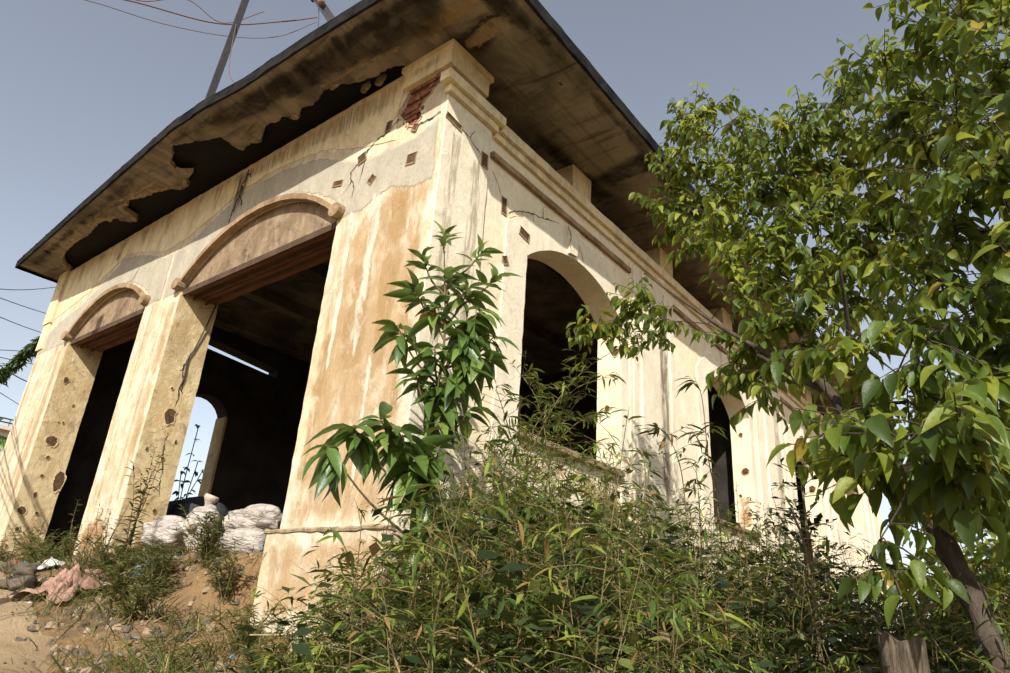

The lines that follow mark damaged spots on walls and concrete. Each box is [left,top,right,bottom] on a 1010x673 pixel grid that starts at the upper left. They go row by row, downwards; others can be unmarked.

leakage [484,0,550,45]
leakage [210,0,438,125]
crack [343,111,441,198]
flaking render [38,62,463,369]
crack [462,129,585,266]
spalling [15,506,39,531]
spalling [45,435,59,460]
spalling [40,468,67,493]
spalling [163,407,178,427]
peeling [360,357,371,433]